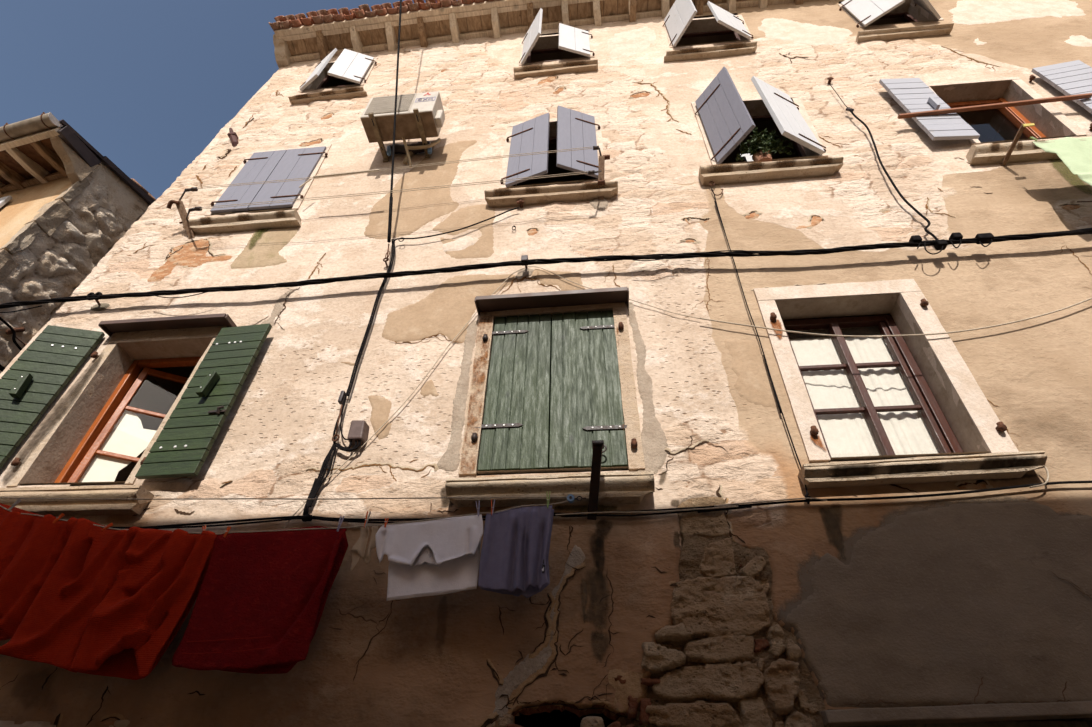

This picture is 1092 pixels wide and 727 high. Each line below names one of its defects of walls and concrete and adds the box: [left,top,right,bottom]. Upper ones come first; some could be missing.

flaking render [949,0,1086,25]
flaking render [364,140,496,259]
spalling [147,238,233,282]
flaking render [382,274,516,343]
flaking render [530,269,585,291]
leakage [820,505,845,559]
crack [329,570,401,681]
crack [477,526,620,727]
leakage [581,519,611,660]
flaking render [487,497,825,727]